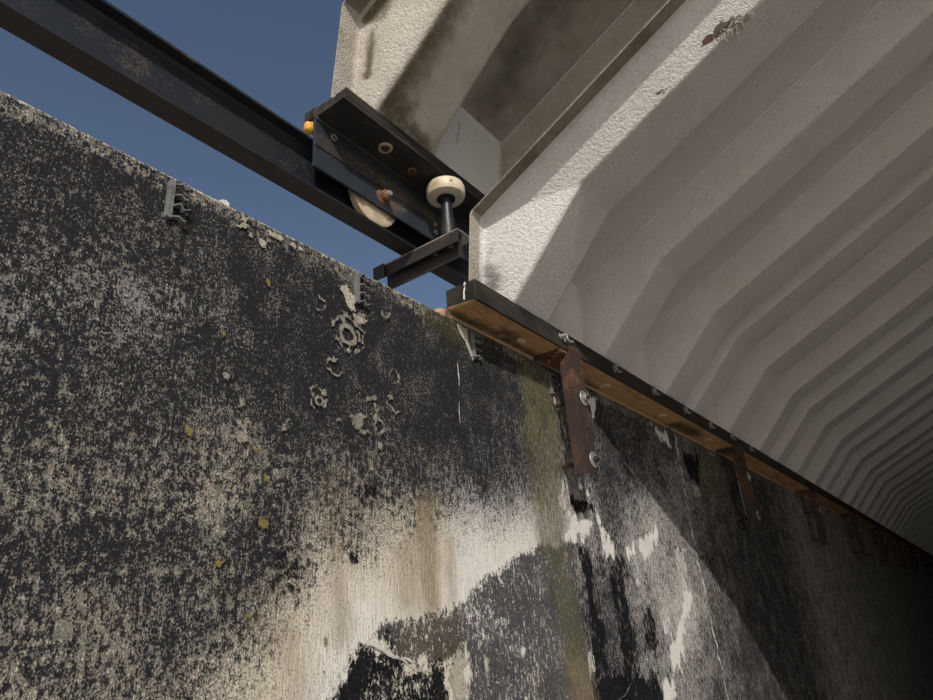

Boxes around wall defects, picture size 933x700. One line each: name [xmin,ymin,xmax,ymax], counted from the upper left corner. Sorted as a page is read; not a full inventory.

water stain [393,0,458,94]
peeling [701,10,761,47]
water stain [486,266,500,284]
water stain [683,450,701,494]
water stain [326,384,693,700]
water stain [266,547,301,604]